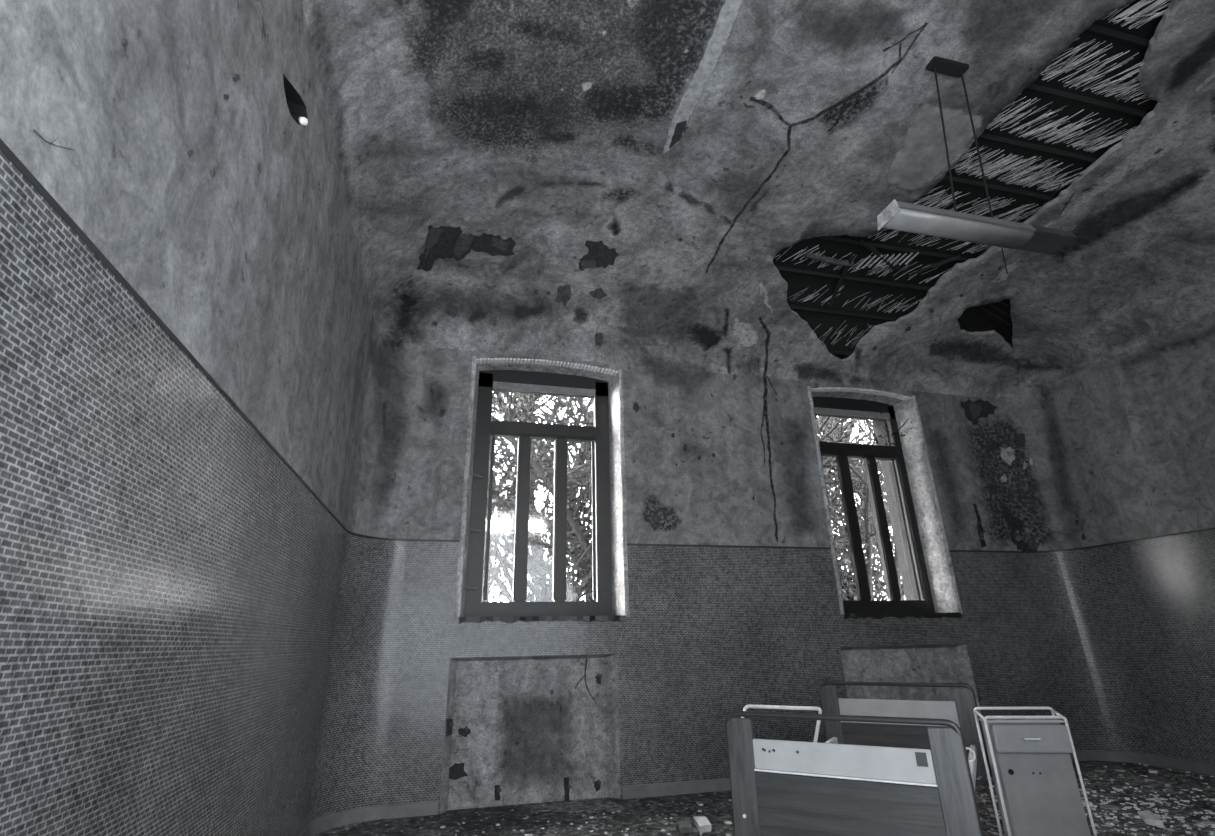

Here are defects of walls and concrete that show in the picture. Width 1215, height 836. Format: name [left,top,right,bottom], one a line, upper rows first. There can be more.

spalling [283,74,308,126]
leakage [414,0,721,154]
leakage [549,178,633,200]
crack [706,22,928,273]
peeling [1045,104,1193,229]
flaking render [417,225,516,271]
flaking render [579,240,619,271]
peeling [533,285,572,307]
peeling [589,288,608,300]
peeling [595,332,603,347]
crack [758,317,779,542]